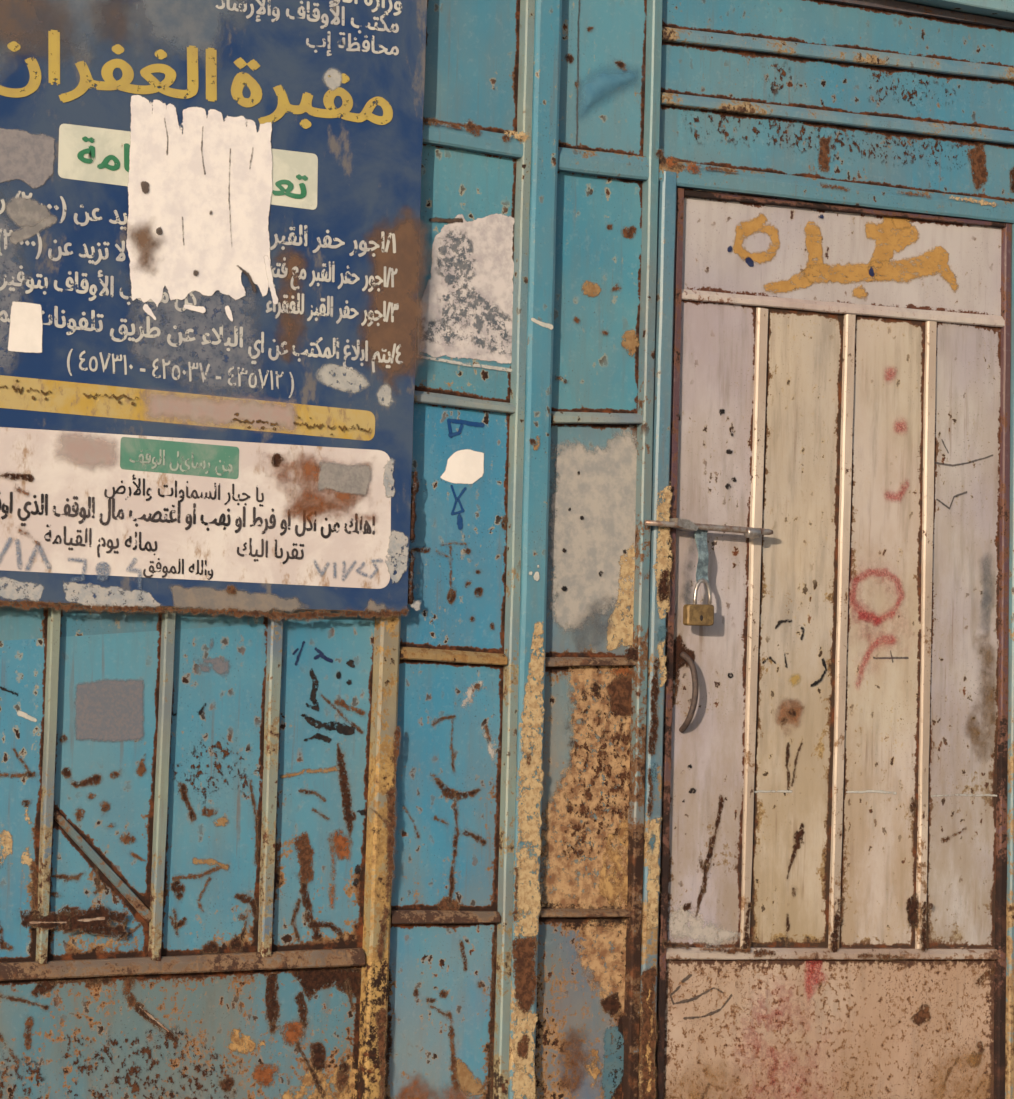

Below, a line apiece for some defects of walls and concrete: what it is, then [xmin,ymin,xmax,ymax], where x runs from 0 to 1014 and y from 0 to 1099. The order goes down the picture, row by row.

corrosion [689,112,996,206]
corrosion [0,471,421,622]
corrosion [271,453,363,520]
peeling [607,545,635,651]
peeling [652,482,672,687]
corrosion [562,646,638,858]
corrosion [19,868,128,939]
corrosion [280,726,401,1099]
peeling [511,622,632,1099]
corrosion [61,1029,236,1099]
corrosion [265,967,362,1034]
corrosion [399,939,497,1099]